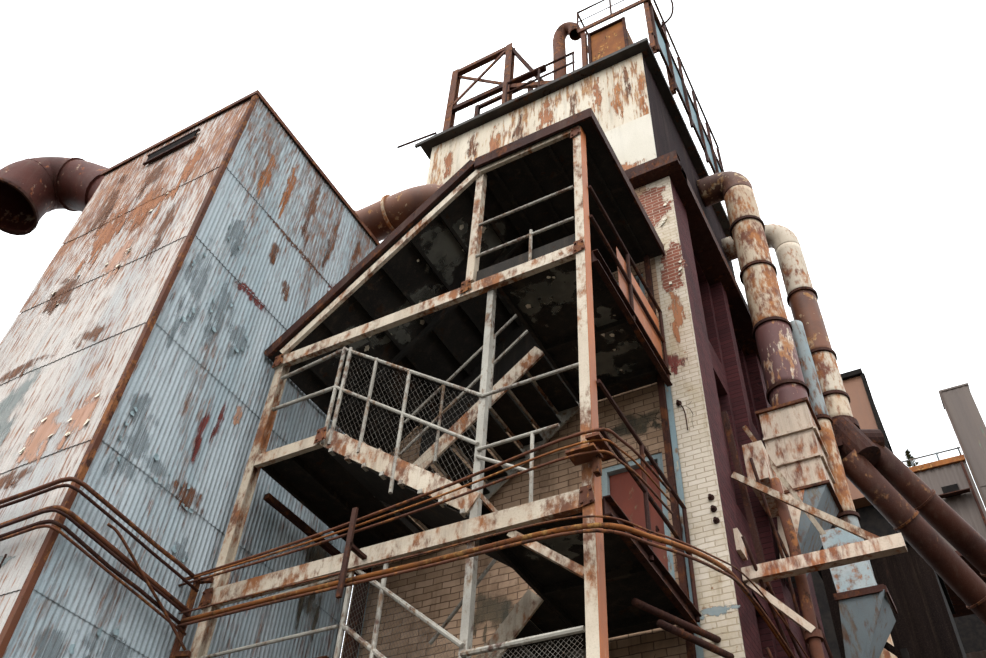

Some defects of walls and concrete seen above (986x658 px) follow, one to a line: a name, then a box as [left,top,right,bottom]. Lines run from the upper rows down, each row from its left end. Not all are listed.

rust [257,155,276,197]
rust [74,162,165,275]
rust [145,146,204,263]
rust [267,165,339,292]
peeling [637,185,676,228]
peeling [659,242,687,293]
rust [235,280,265,312]
rust [73,324,105,348]
peeling [17,392,100,463]
rust [191,403,243,464]
rust [0,468,30,489]